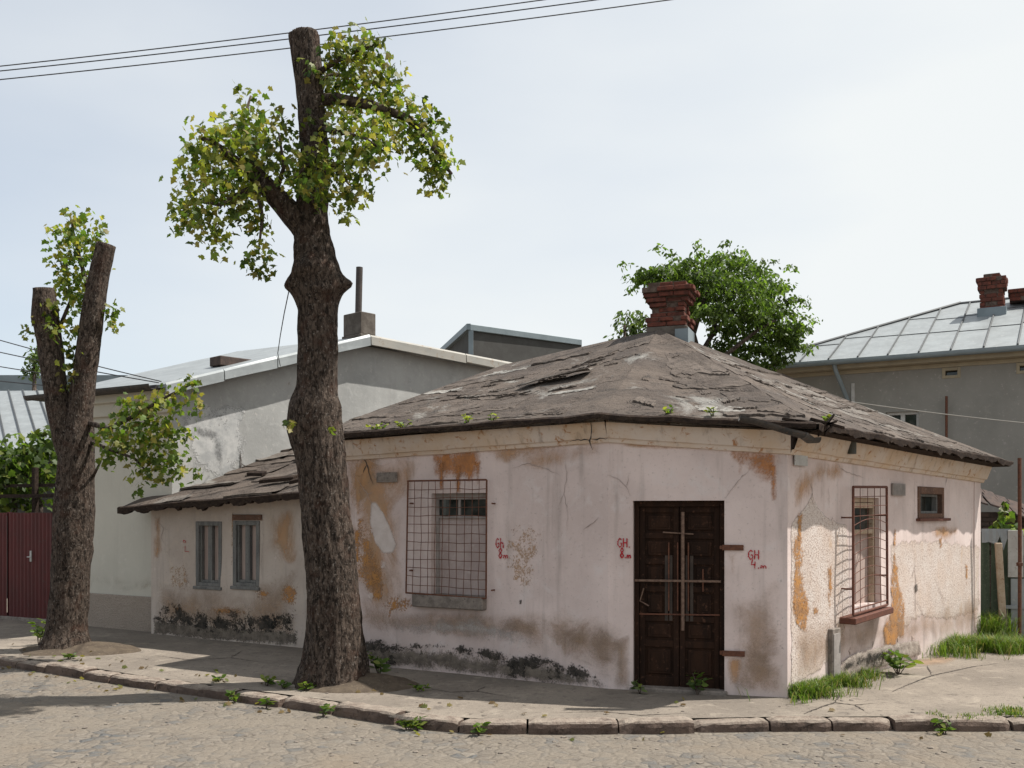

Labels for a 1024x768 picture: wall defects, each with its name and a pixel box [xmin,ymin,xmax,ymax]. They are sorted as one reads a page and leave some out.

crack [514,424,607,528]
damp [153,594,294,634]
peeling [355,519,412,617]
mould [365,639,596,680]
peeling [791,494,849,684]
peeling [841,540,980,676]